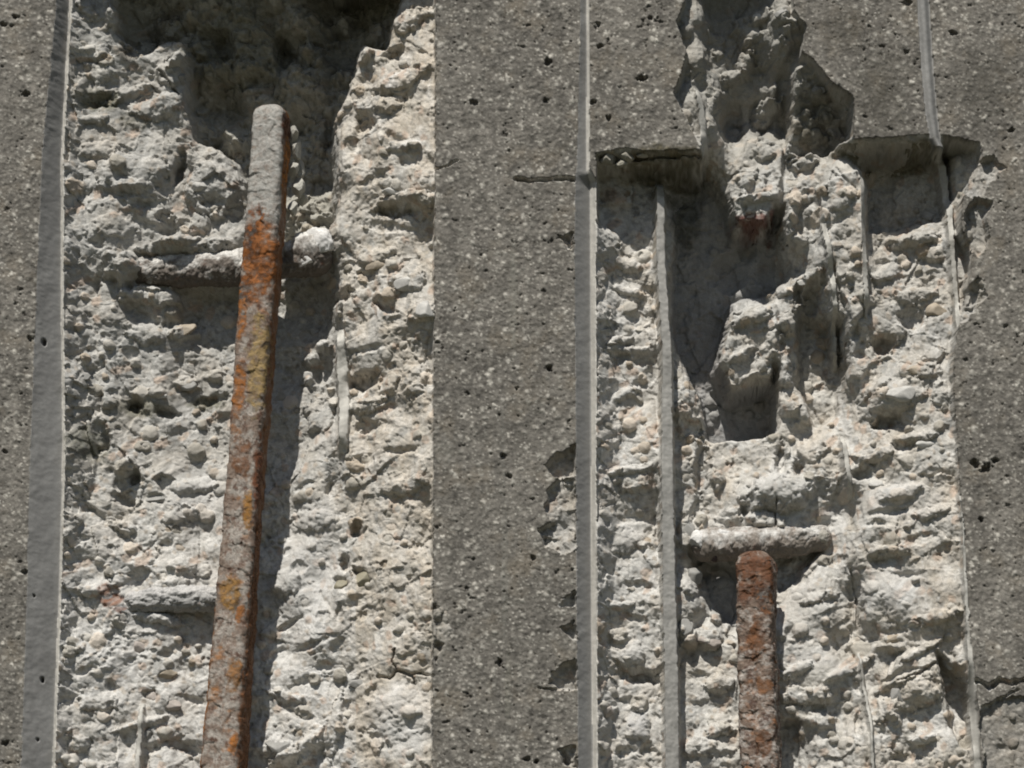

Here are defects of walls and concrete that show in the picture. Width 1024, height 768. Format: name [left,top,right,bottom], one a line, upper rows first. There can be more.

rust [281,113,291,207]
rust [231,210,283,427]
spalling [55,0,453,768]
spalling [596,0,1024,768]
spalling [538,444,578,555]
rust [214,432,267,768]
spalling [549,660,578,690]
spalling [558,590,577,608]
spalling [561,621,578,641]
rust [735,551,778,660]